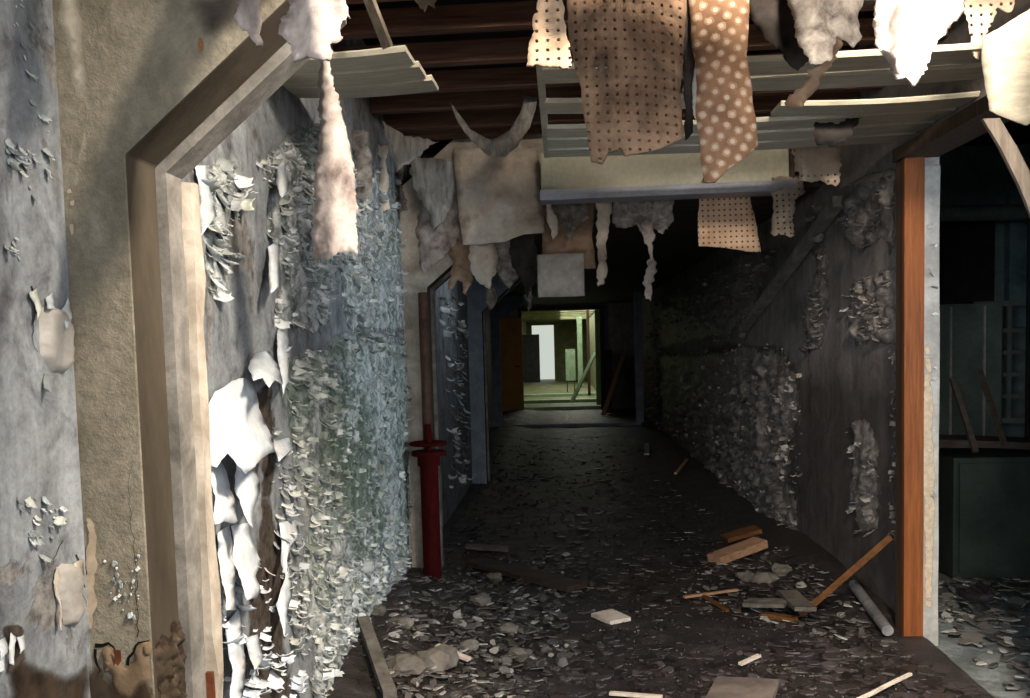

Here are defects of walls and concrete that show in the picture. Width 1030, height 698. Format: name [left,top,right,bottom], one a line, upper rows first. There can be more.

peeling [197,122,416,698]
peeling [650,249,803,530]
peeling [799,233,896,541]
spalling [101,621,188,698]